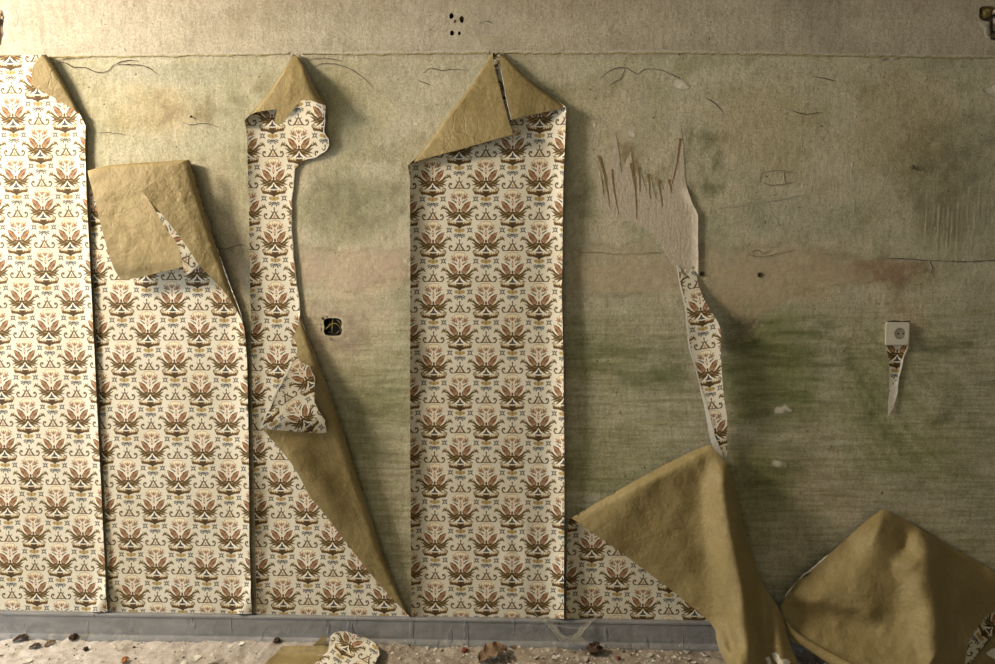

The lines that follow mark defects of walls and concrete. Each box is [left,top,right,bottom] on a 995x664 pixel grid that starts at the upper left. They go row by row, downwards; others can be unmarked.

peeling [262,316,409,616]
peeling [766,652,791,664]